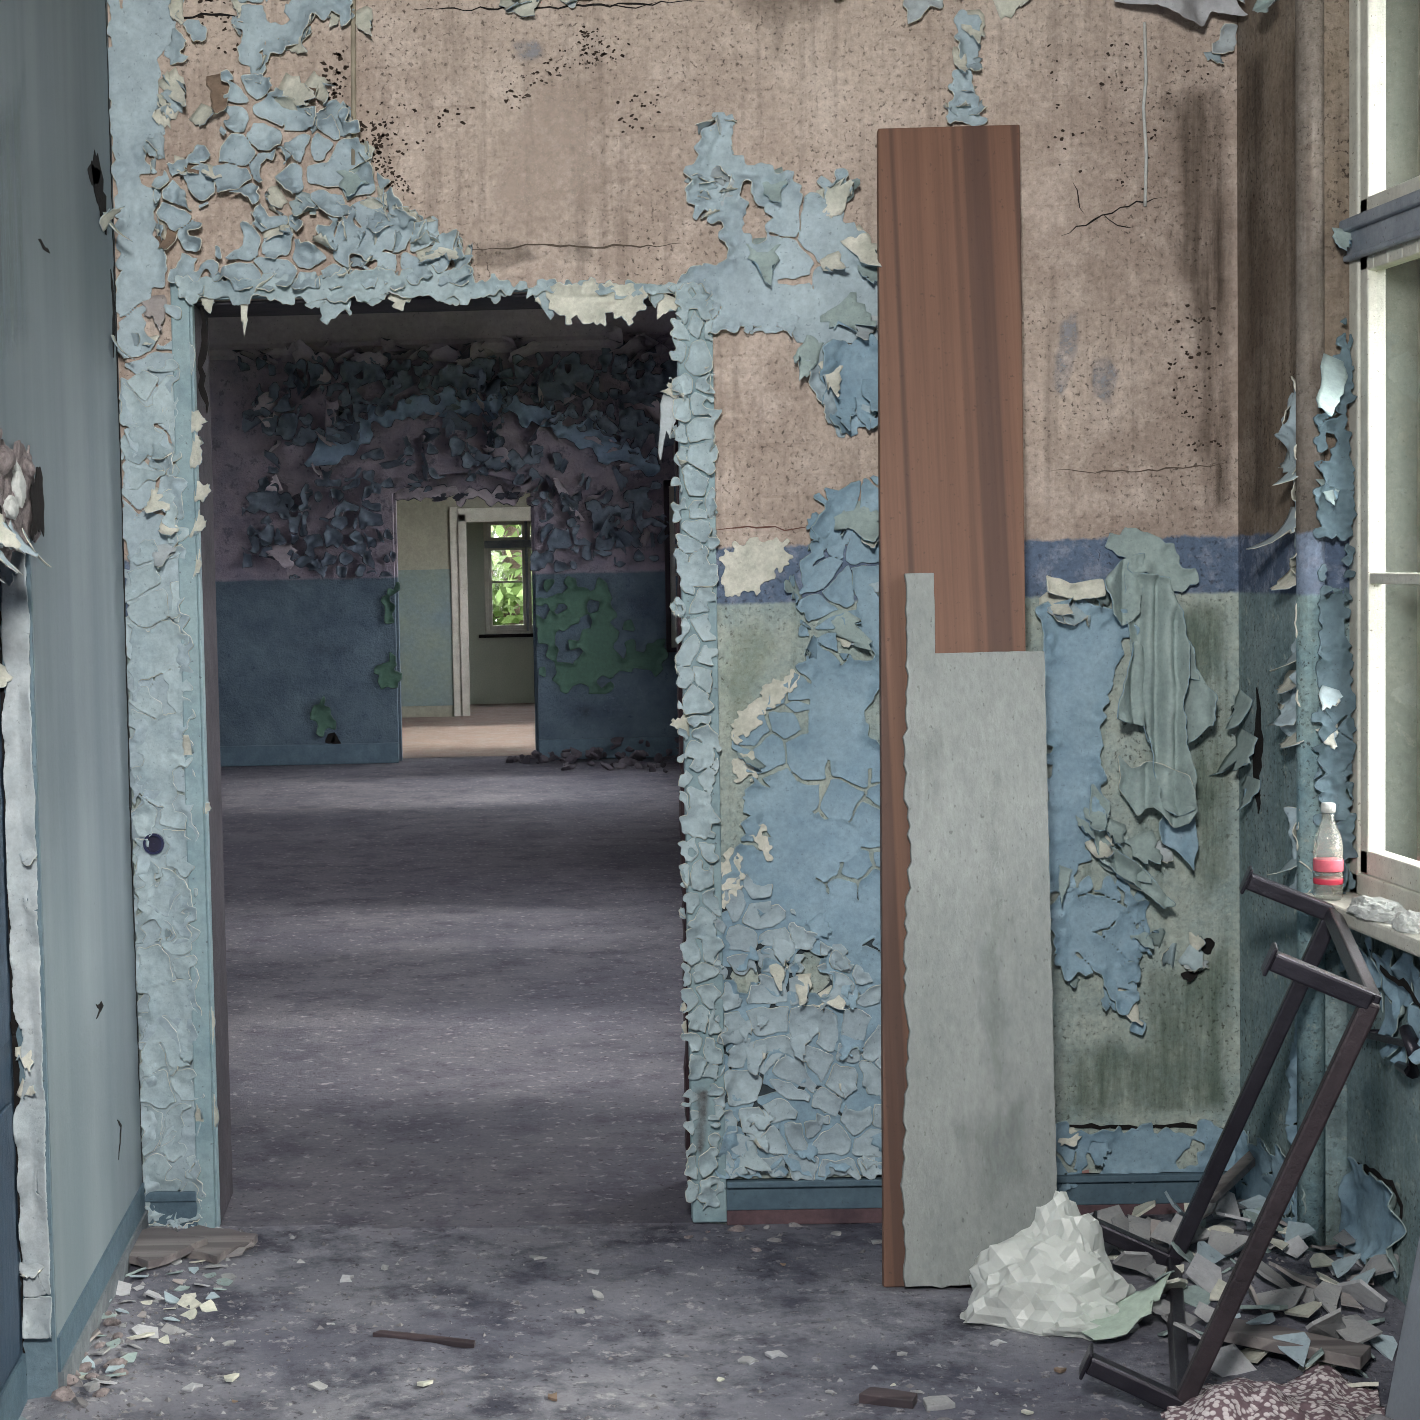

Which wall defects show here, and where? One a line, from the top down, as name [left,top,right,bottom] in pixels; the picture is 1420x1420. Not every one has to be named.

peeling [902,0,1029,126]
peeling [1114,0,1277,80]
peeling [1332,228,1352,251]
peeling [1035,304,1359,1036]
peeling [0,428,52,1353]
peeling [1357,936,1420,1065]
peeling [1089,1014,1313,1339]
peeling [1210,1156,1407,1377]